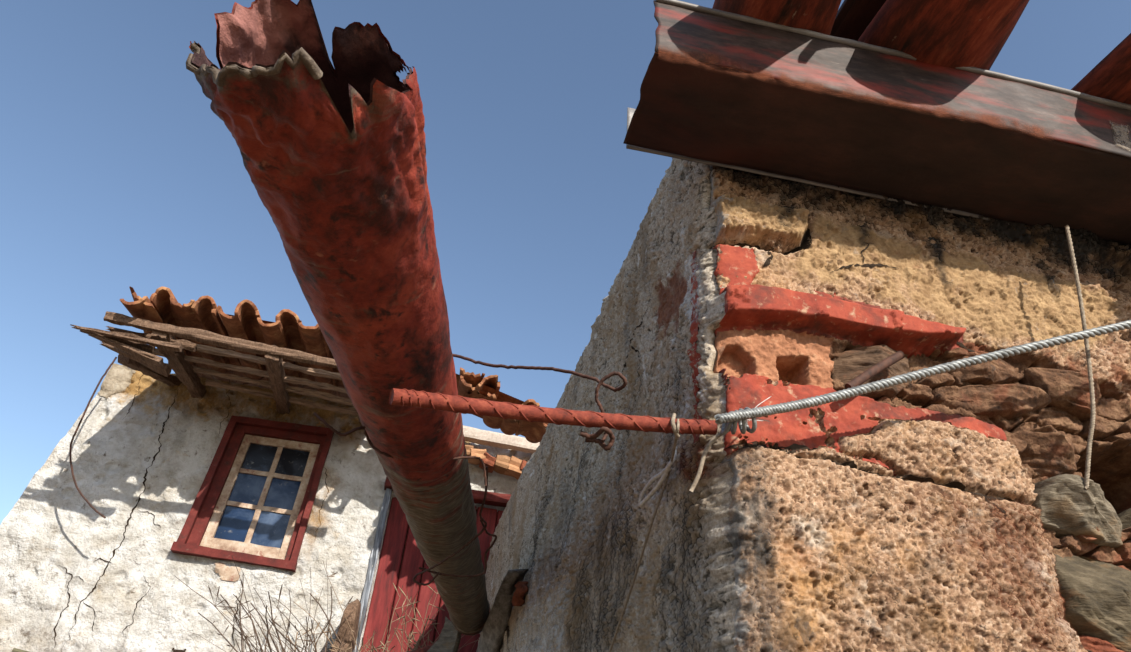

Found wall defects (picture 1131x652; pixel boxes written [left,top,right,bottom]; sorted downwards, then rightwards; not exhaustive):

rust [659,48,825,90]
rust [933,107,1046,136]
crack [53,387,178,652]
spalling [389,244,1131,652]
crack [725,441,1039,522]